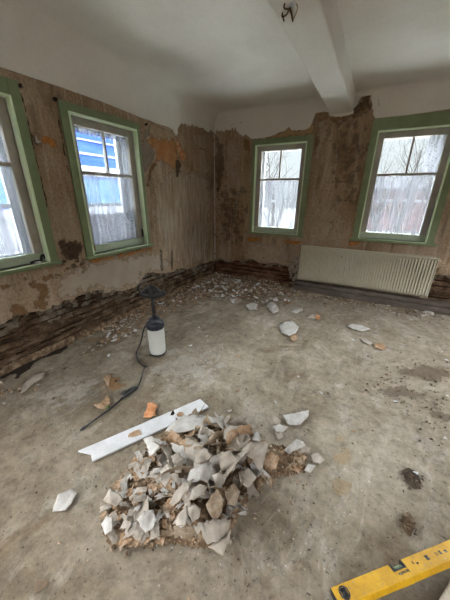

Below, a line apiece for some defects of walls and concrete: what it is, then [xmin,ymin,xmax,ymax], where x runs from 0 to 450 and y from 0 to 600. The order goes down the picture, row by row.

peeling [145,123,186,186]
damp [150,137,248,271]
flaking render [315,95,372,122]
flaking render [0,256,300,377]